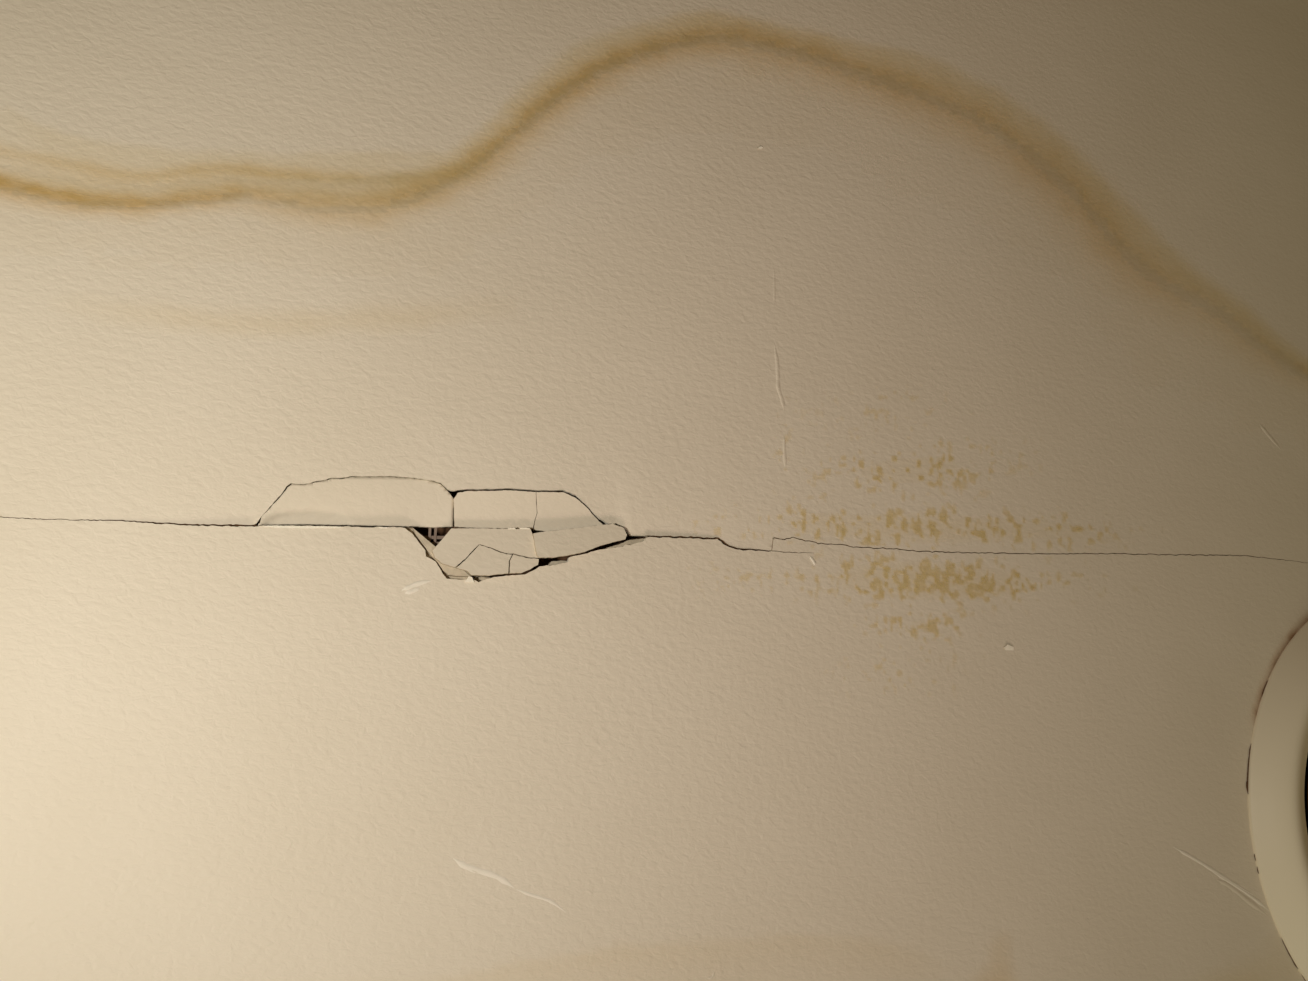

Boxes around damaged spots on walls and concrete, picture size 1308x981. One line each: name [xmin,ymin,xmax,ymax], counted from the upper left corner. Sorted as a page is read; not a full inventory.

leakage [359,30,914,207]
leakage [0,175,245,210]
crack [0,516,257,527]
spalling [254,476,647,594]
leakage [865,511,1021,544]
crack [642,536,1303,563]
leakage [841,561,1035,598]